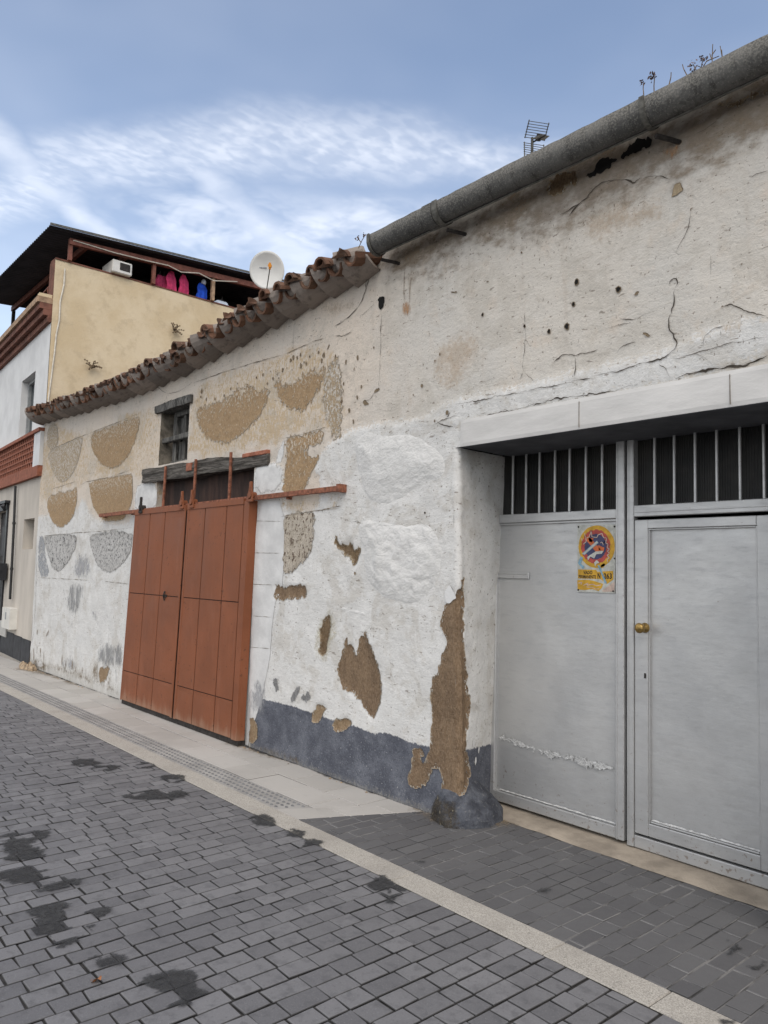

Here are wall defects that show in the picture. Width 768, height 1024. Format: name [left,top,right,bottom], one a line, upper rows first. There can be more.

crack [560,176,668,215]
crack [438,195,766,427]
peeling [274,510,316,601]
spalling [334,535,361,575]
spalling [318,615,331,656]
spalling [335,631,382,719]
spalling [408,577,480,829]
peeling [499,733,613,770]
leakage [123,762,188,800]
leakage [0,830,82,948]
leakage [137,969,208,1007]